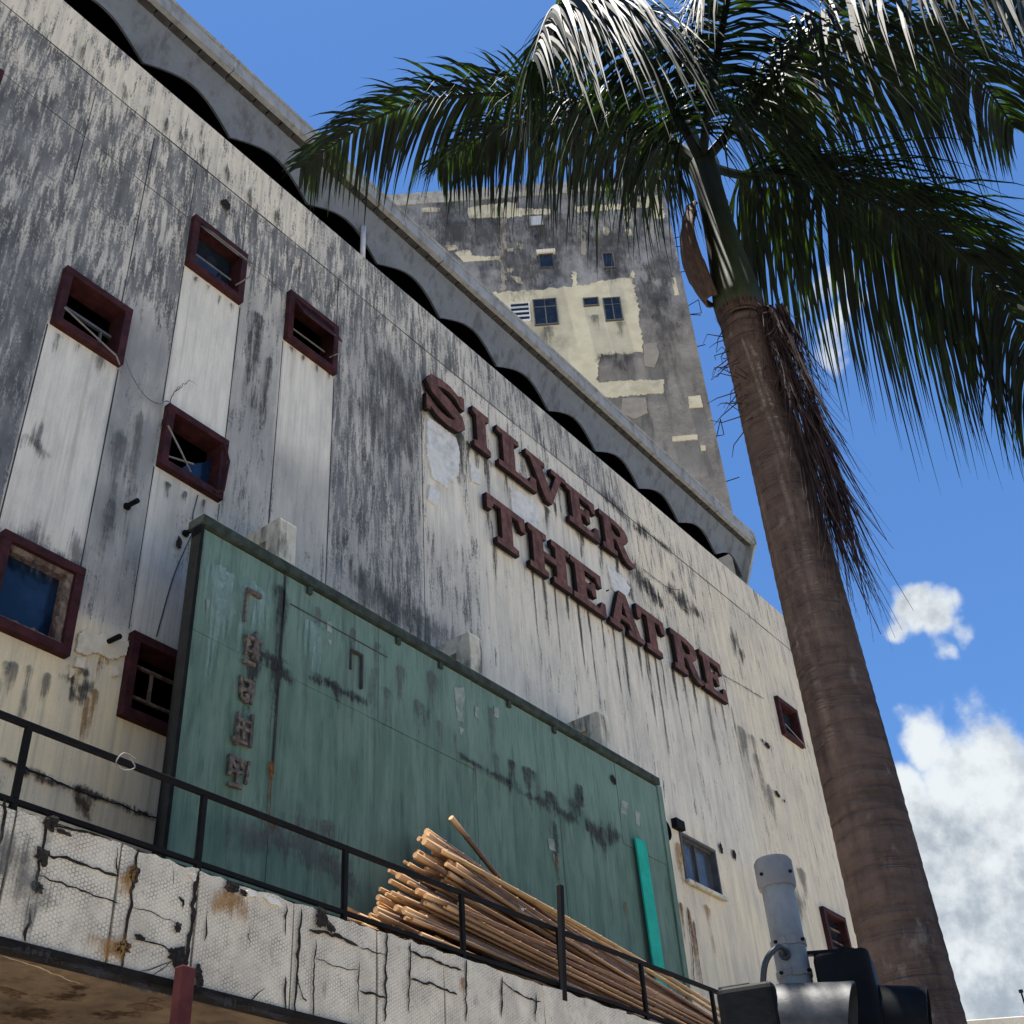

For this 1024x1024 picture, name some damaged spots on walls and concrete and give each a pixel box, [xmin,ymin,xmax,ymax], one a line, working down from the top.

peeling [445,195,665,420]
leakage [247,311,272,420]
peeling [425,417,480,507]
peeling [508,487,541,528]
leakage [615,557,699,617]
leakage [532,571,775,817]
leakage [2,757,148,820]
leakage [455,734,619,873]
crack [3,911,80,984]
rust [104,939,125,958]
crack [35,812,208,975]
crack [252,904,468,1022]